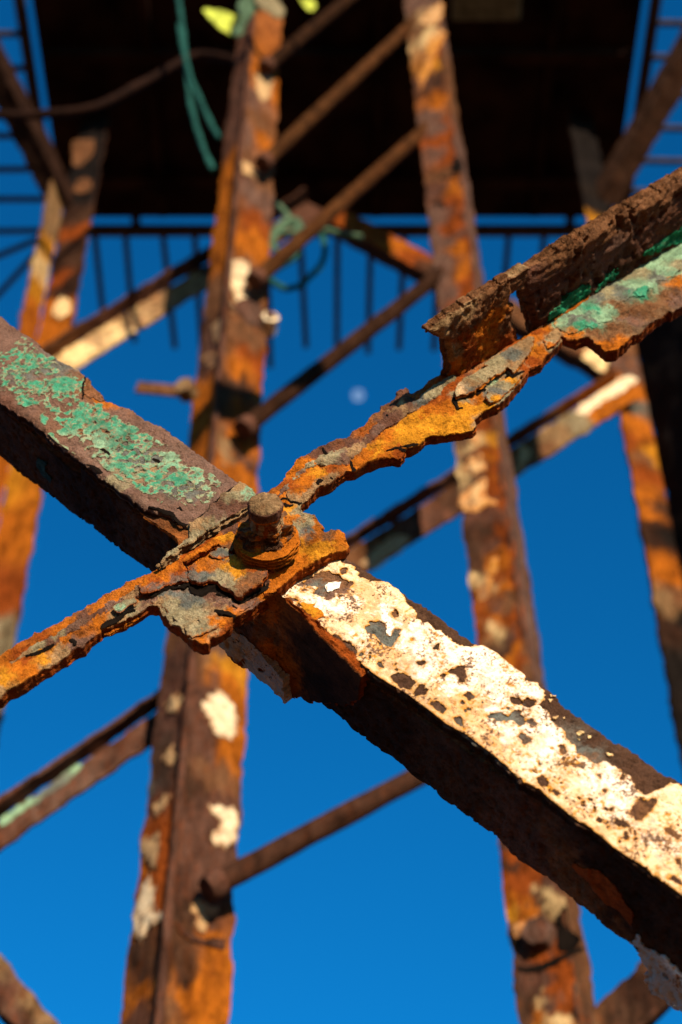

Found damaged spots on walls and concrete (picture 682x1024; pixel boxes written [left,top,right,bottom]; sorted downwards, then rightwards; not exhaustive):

peeling [547,227,682,334]
corrosion [454,283,608,405]
peeling [0,292,222,506]
corrosion [103,531,269,639]
corrosion [301,602,325,620]
peeling [282,534,682,896]
corrosion [154,823,171,914]
corrosion [572,863,634,926]